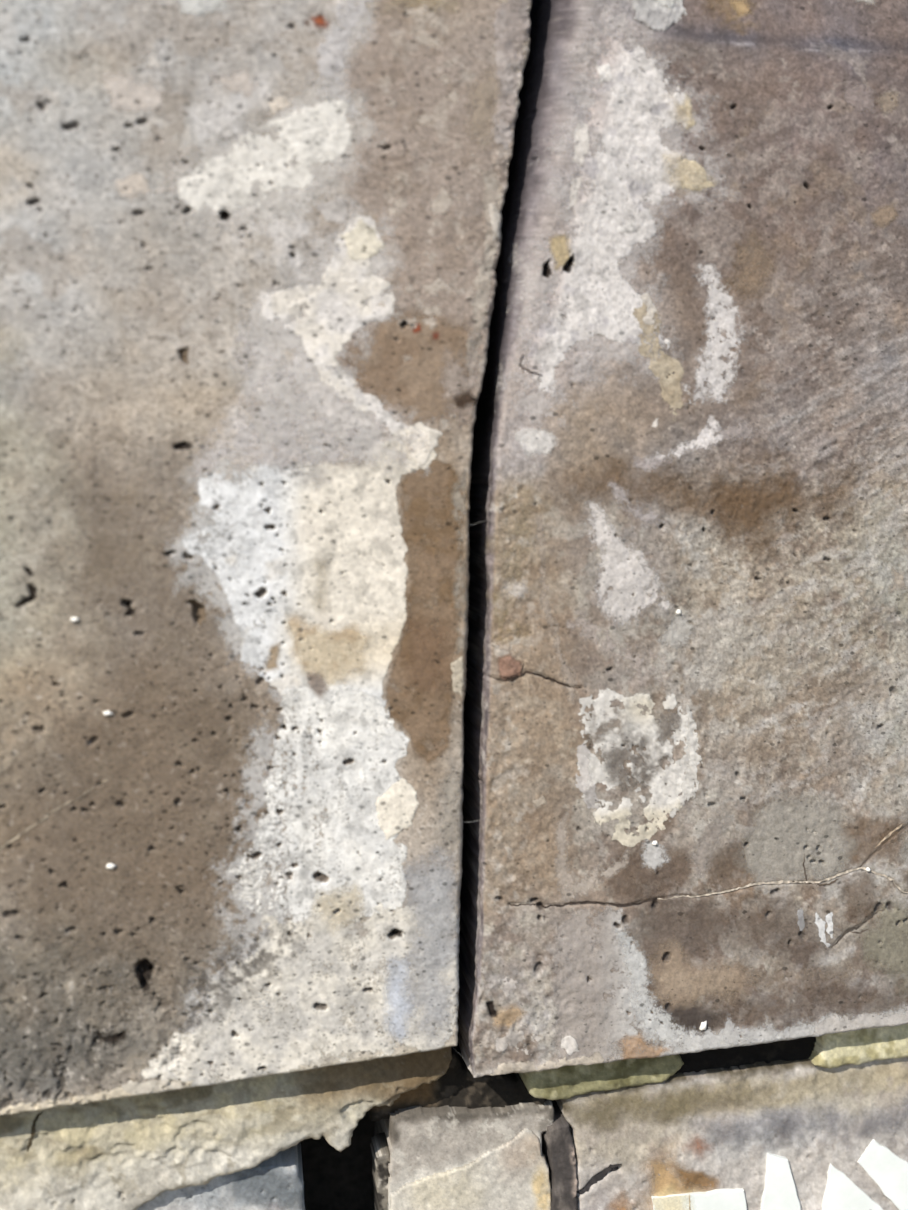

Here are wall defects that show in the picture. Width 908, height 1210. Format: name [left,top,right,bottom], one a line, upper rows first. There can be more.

leakage [528,33,743,427]
leakage [348,278,478,430]
crack [519,354,543,376]
leakage [634,417,757,470]
leakage [267,646,279,669]
leakage [289,619,365,695]
leakage [387,460,465,762]
crack [487,663,581,688]
leakage [537,469,672,703]
crack [509,823,908,948]
leakage [142,857,460,1088]
rust [653,1164,715,1210]